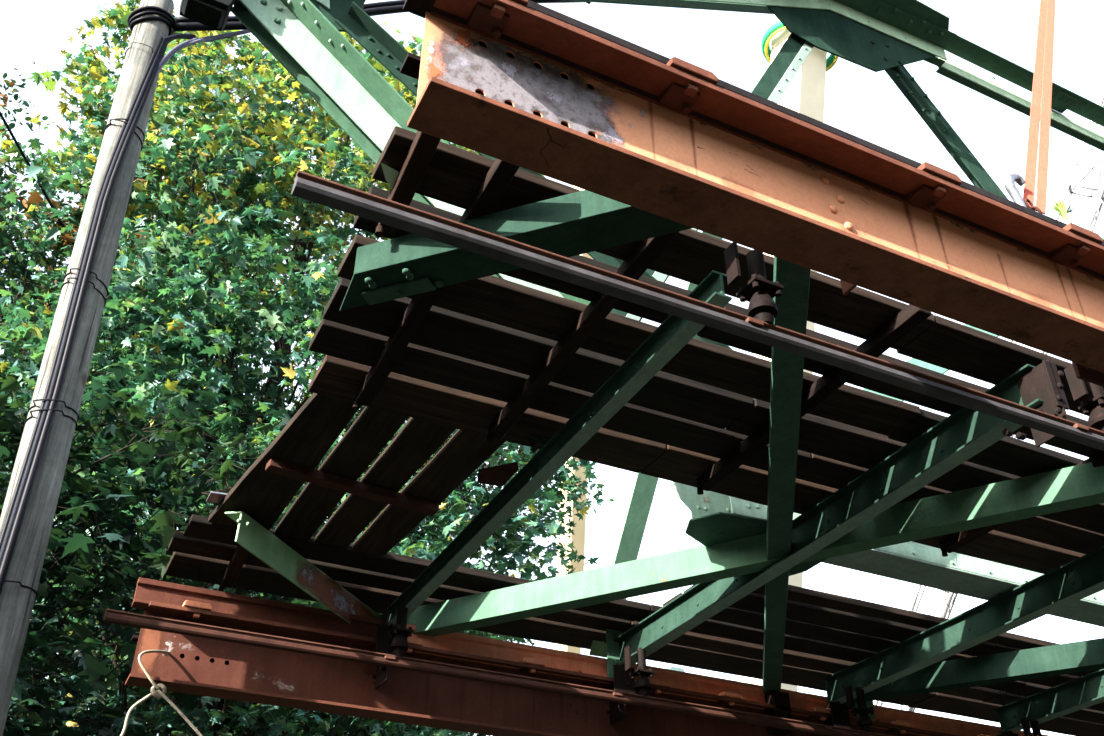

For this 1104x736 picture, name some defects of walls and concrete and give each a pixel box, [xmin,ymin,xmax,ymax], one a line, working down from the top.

peeling [425,30,623,145]